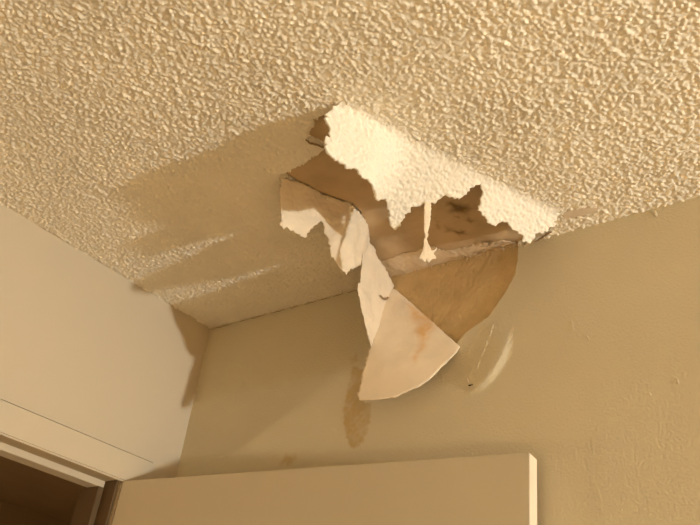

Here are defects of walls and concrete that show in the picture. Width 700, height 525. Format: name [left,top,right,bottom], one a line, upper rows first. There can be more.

water stain [341,351,373,450]
peeling [279,101,601,401]